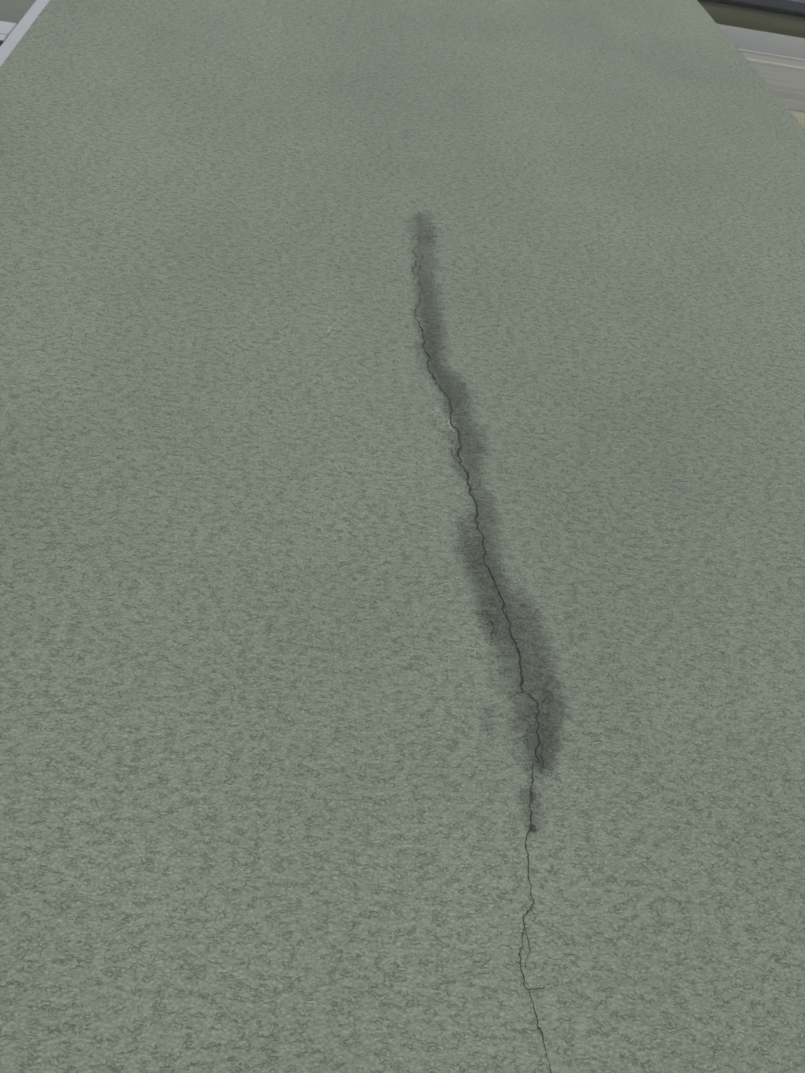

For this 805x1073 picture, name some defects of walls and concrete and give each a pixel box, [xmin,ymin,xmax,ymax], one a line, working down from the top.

crack [412,223,551,1073]